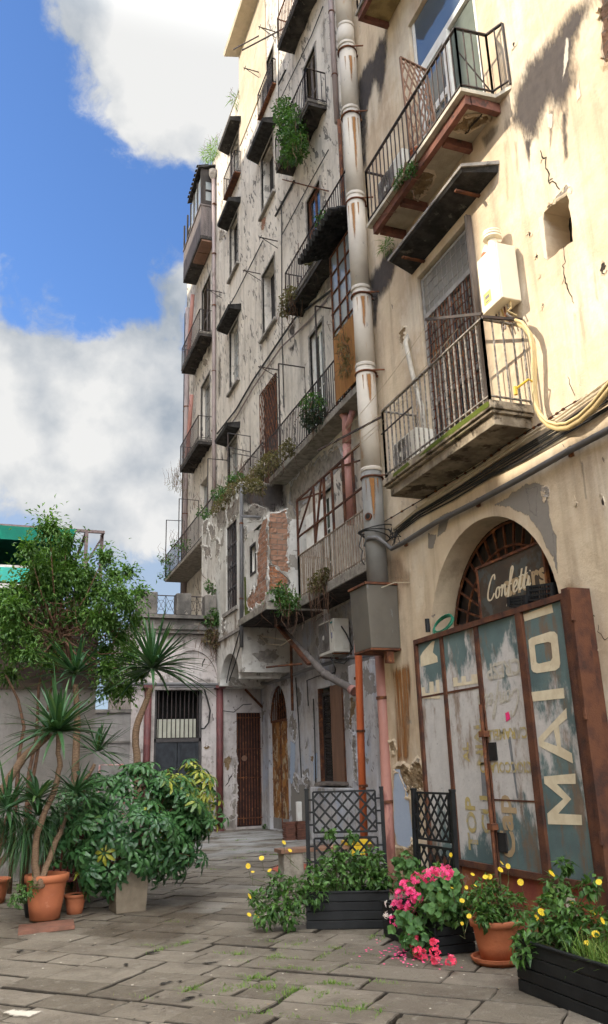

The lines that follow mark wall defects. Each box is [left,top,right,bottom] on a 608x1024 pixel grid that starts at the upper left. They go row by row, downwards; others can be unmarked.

corrosion [348,116,359,168]
crack [540,150,560,190]
spalling [526,183,572,260]
peeling [201,442,343,611]
corrosion [393,664,410,760]
spalling [388,739,424,802]